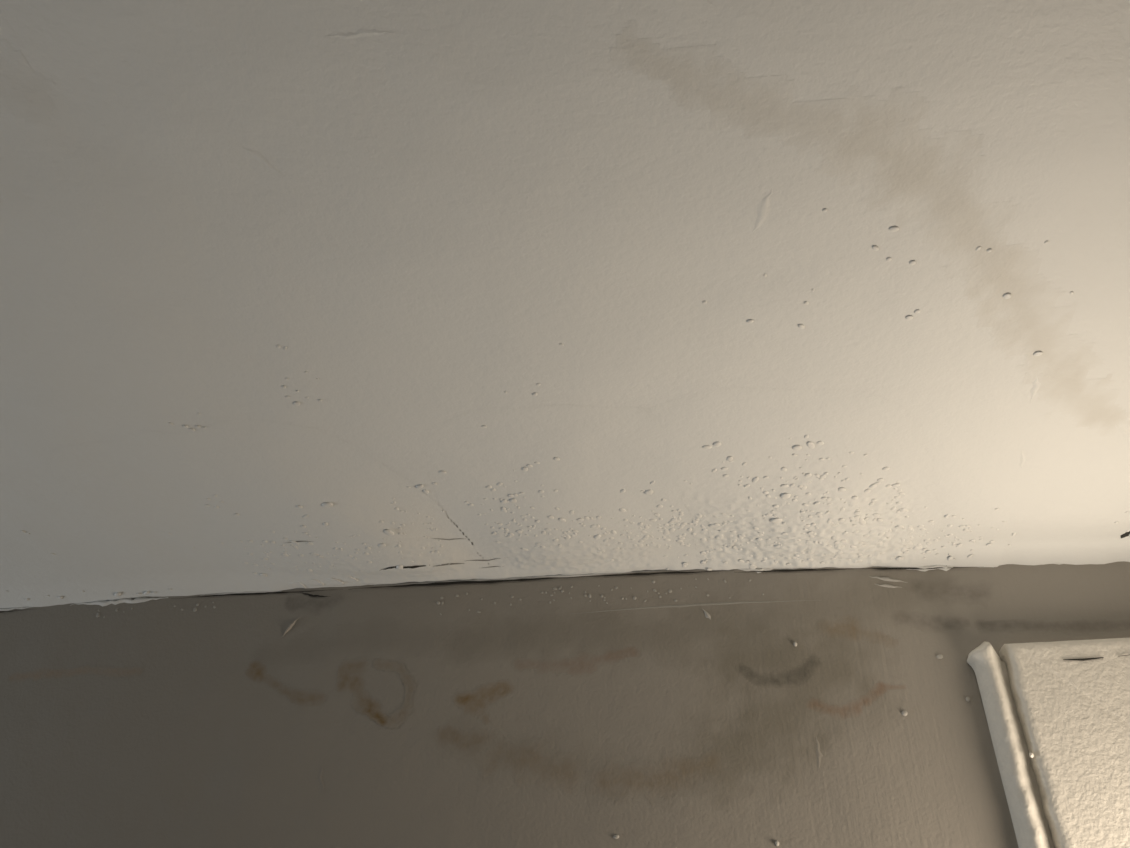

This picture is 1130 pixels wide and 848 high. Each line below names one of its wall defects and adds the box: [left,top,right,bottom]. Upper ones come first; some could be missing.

leakage [244,568,1130,841]